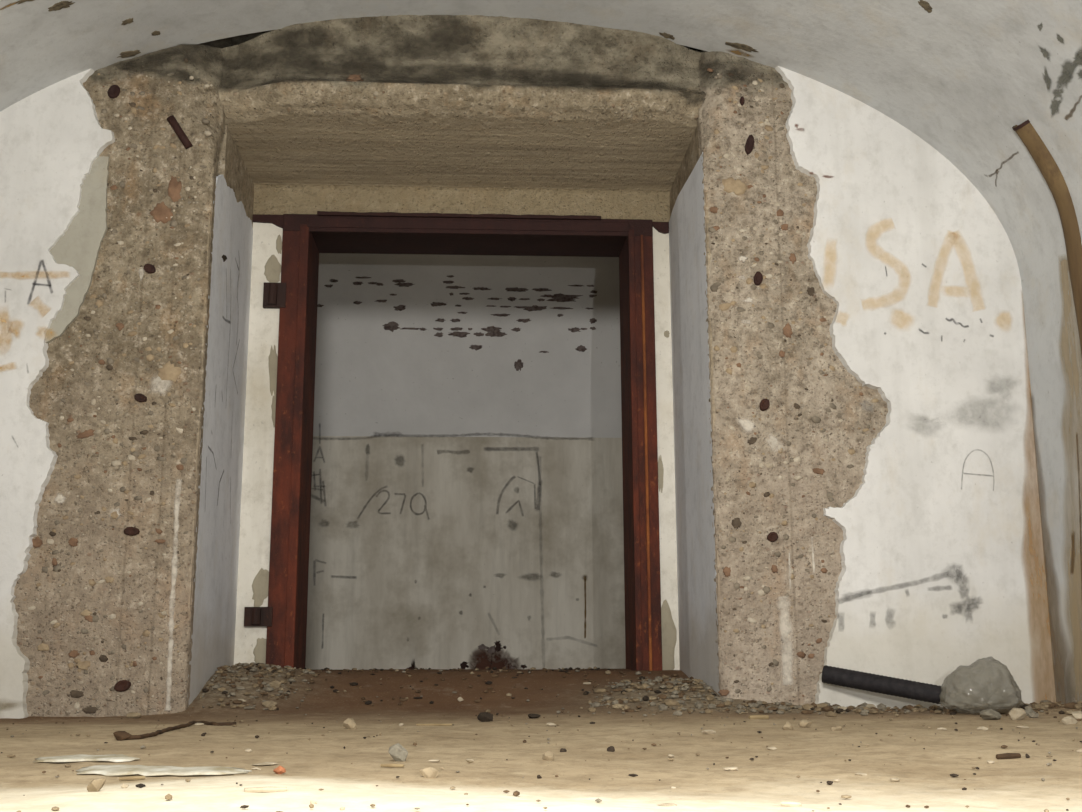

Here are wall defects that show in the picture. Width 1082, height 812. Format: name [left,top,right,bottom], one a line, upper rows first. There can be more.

peeling [918,0,932,13]
leakage [118,20,665,89]
leakage [701,61,744,81]
leakage [1040,47,1082,115]
crack [1065,102,1079,120]
spalling [13,15,888,717]
rust [1061,259,1082,471]
rust [1025,488,1082,704]